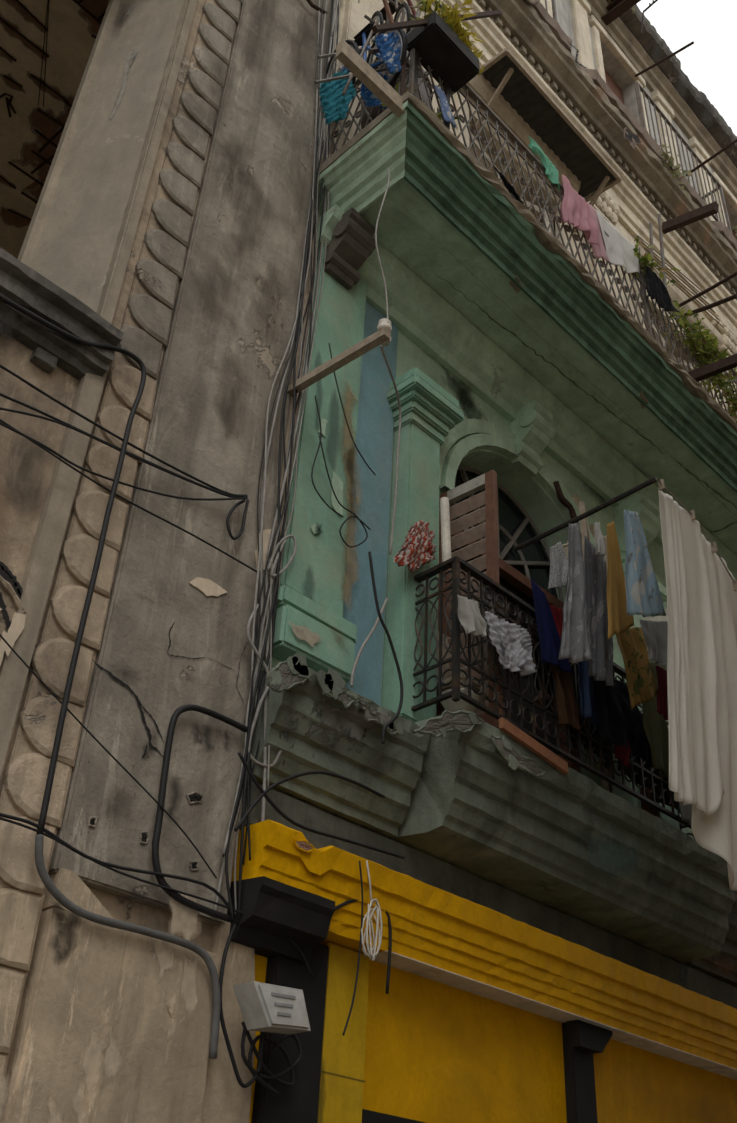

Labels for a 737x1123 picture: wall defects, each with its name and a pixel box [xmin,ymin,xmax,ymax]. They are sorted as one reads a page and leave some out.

spalling [8,109,65,186]
peeling [255,529,272,572]
peeling [189,577,227,597]
peeling [0,608,26,666]